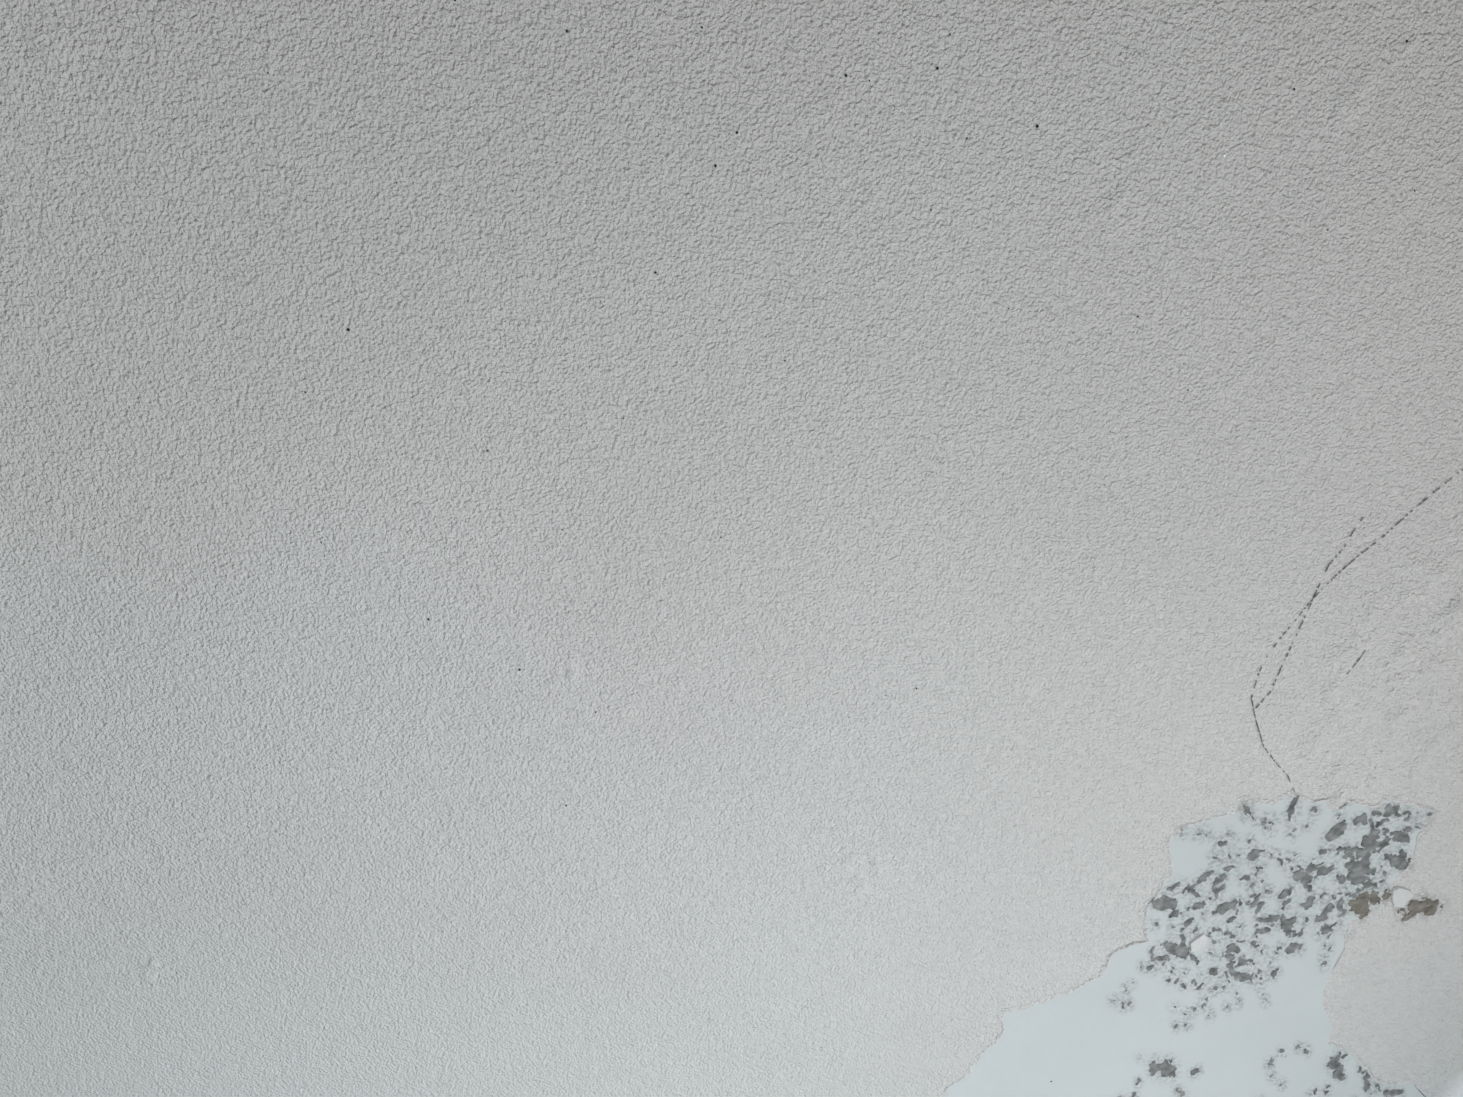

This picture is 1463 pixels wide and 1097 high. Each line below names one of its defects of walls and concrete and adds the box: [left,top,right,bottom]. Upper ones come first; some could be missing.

peeling [939,791,1444,1097]